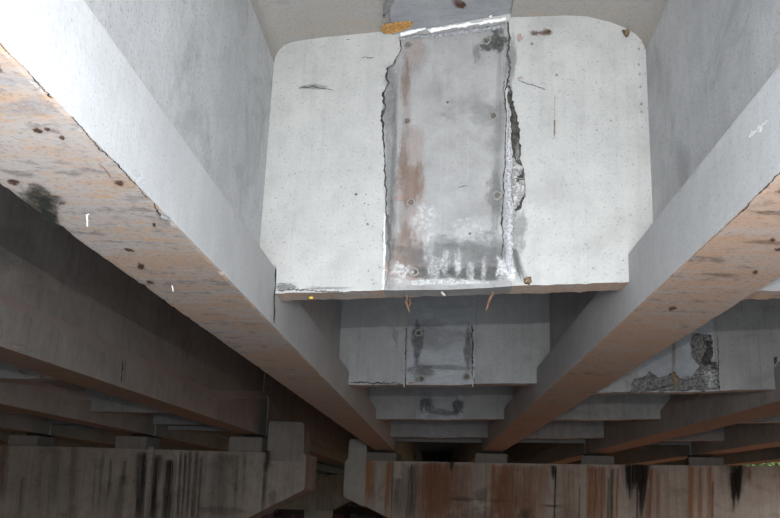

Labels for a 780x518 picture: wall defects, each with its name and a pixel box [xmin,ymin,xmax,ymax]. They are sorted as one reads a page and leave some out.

rust [382,21,413,34]
peeling [400,15,506,37]
crack [363,40,402,284]
spalling [507,80,526,211]
leakage [448,249,523,281]
crack [273,268,368,321]
spalling [629,333,720,393]
leakage [136,446,198,518]
leakage [626,464,649,518]
leakage [729,465,745,505]